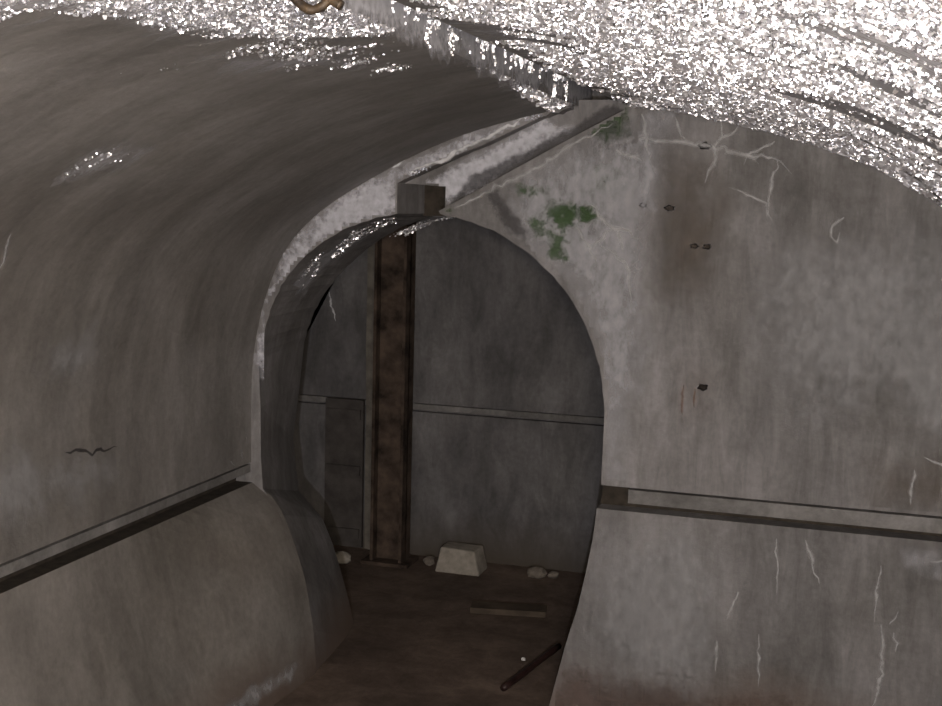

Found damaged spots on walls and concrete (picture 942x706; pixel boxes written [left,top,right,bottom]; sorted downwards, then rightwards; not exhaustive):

crack [616,114,790,218]
water stain [270,179,395,296]
water stain [392,107,653,407]
crack [910,458,942,504]